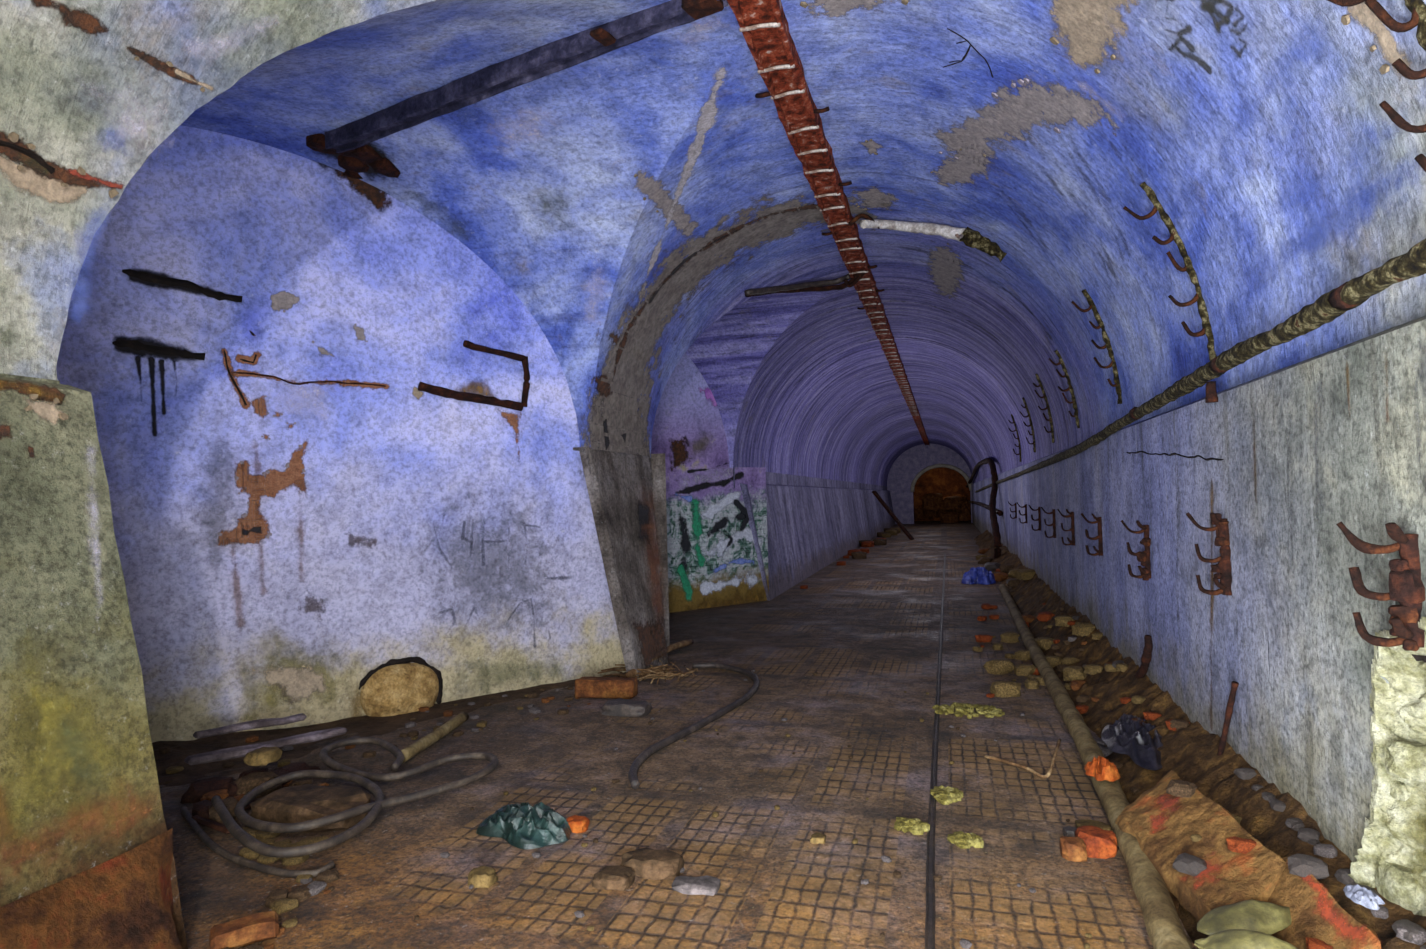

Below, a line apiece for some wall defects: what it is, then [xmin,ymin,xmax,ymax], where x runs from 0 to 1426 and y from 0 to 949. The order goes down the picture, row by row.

flaking render [127,46,214,92]
peeling [800,0,910,17]
peeling [1049,0,1137,74]
flaking render [0,131,124,204]
spalling [634,68,726,312]
peeling [930,75,1119,190]
peeling [252,395,296,440]
peeling [217,442,308,546]
spalling [1348,617,1426,916]